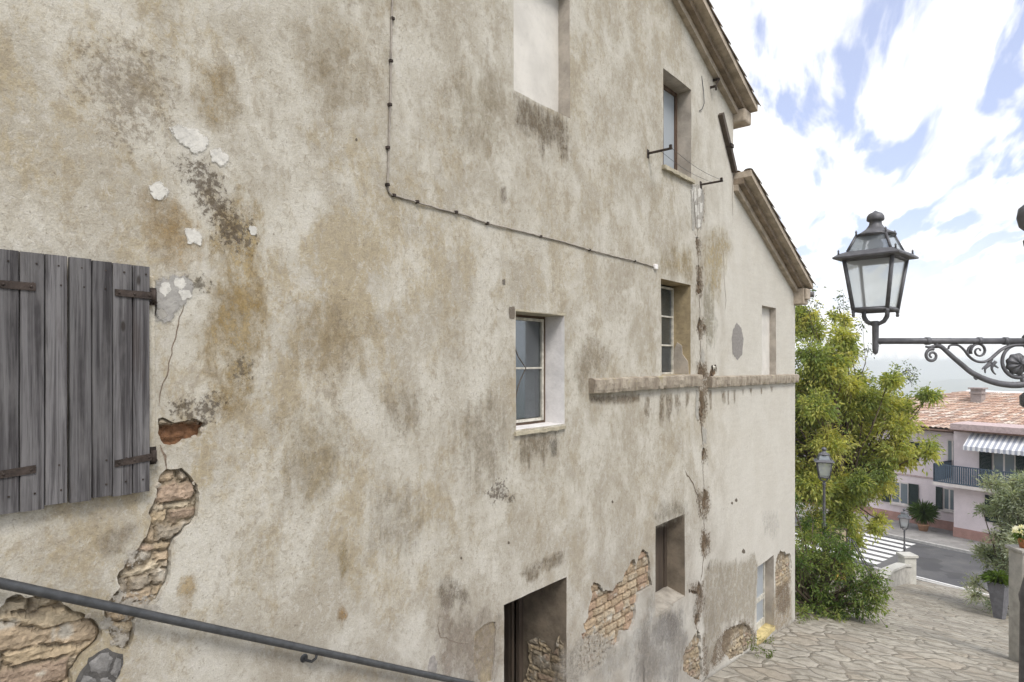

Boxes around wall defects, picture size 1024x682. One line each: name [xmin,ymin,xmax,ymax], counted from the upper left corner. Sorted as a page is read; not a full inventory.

peeling [169,124,229,167]
water stain [517,100,567,157]
peeling [149,181,170,200]
peeling [185,228,202,246]
peeling [159,277,192,301]
water stain [168,152,264,425]
crack [159,307,184,403]
flaking render [158,418,204,445]
crack [685,186,757,681]
peeling [85,591,160,649]
flaking render [567,551,649,679]
crack [776,581,790,615]